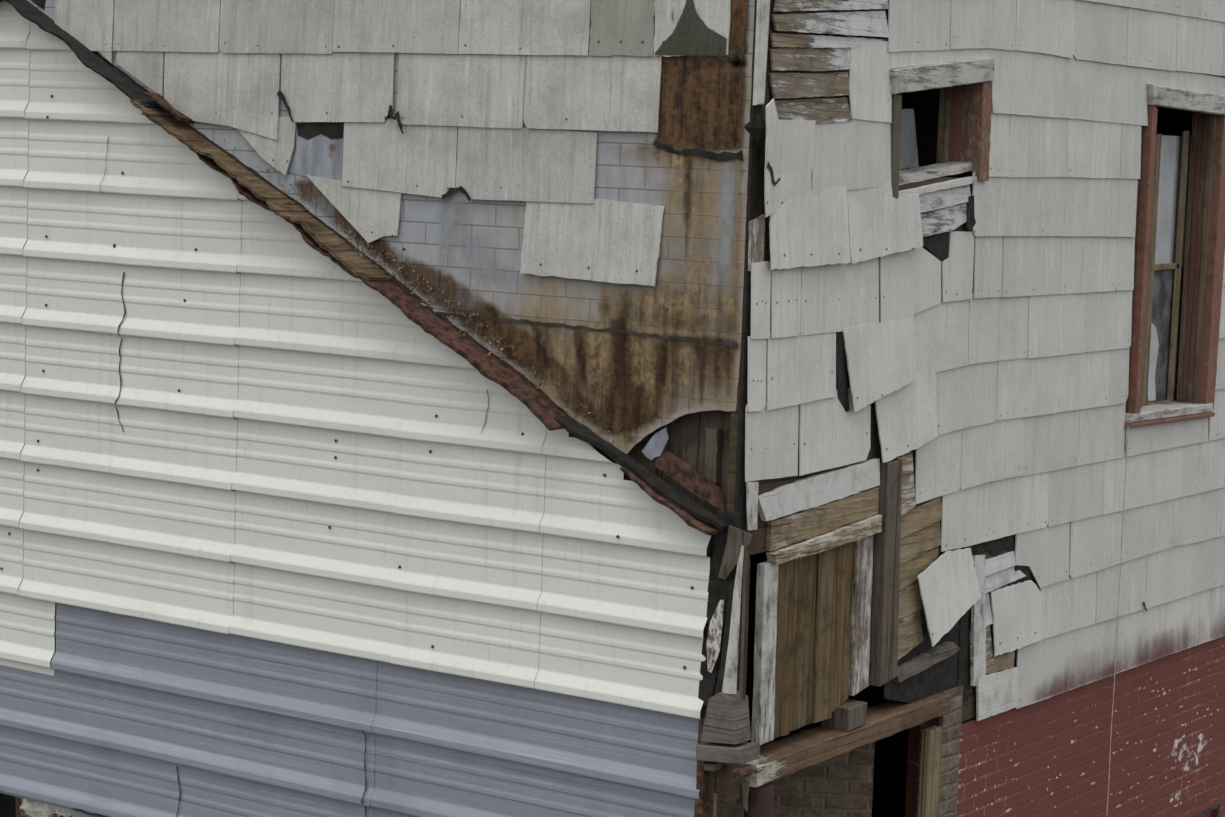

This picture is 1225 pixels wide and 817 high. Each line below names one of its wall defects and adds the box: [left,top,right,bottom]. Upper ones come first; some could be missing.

water stain [655,0,727,56]
peeling [769,0,889,124]
rust [141,92,737,441]
peeling [896,452,942,660]
peeling [958,535,1031,687]